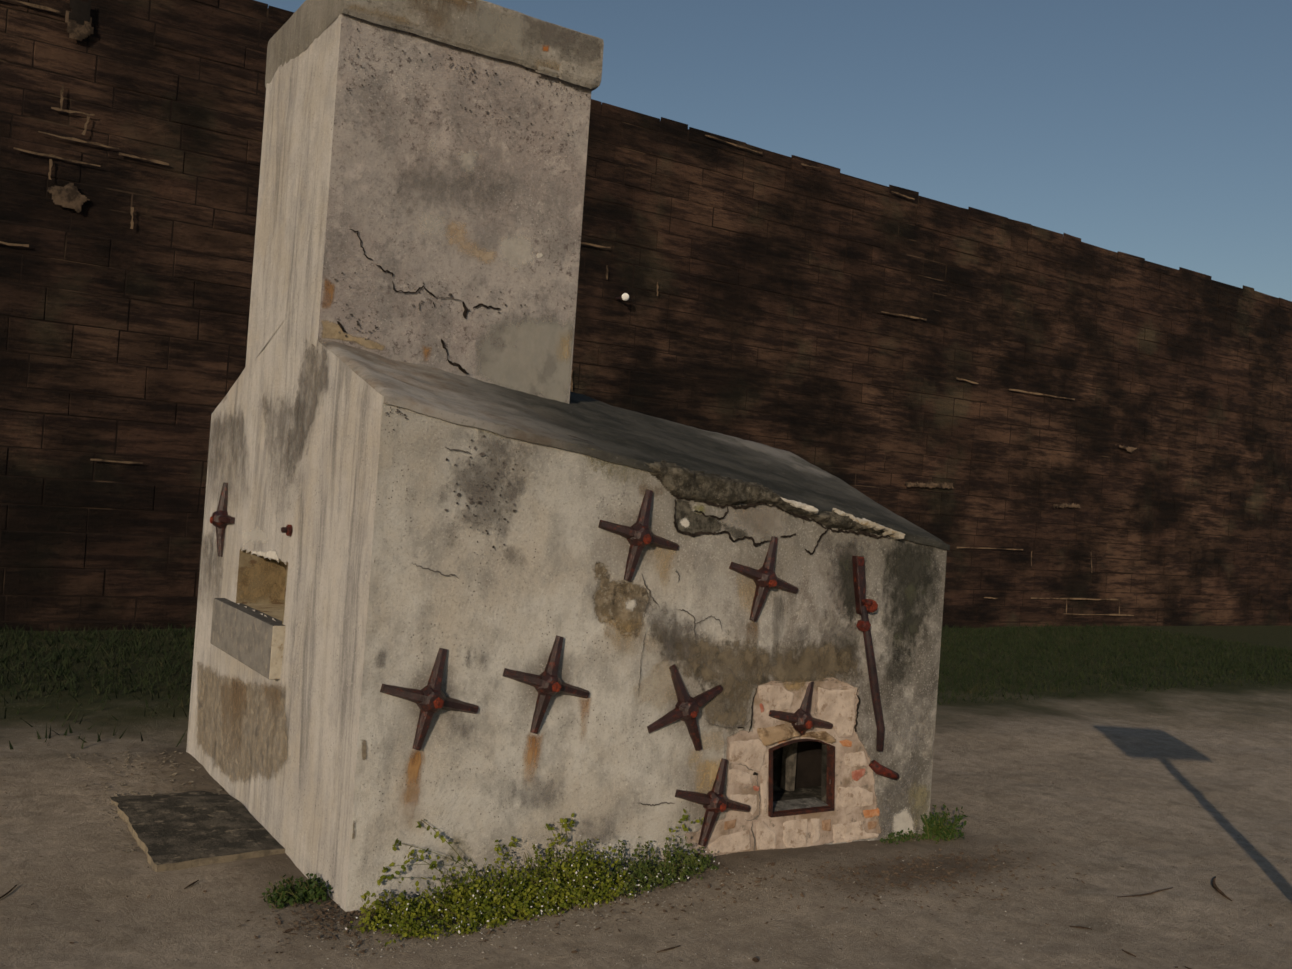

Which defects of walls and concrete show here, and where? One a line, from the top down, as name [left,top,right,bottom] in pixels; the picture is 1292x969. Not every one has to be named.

crack [350,229,501,327]
crack [441,339,469,374]
crack [657,477,891,555]
spalling [645,460,905,541]
crack [638,570,722,697]
damp [646,538,869,731]
damp [883,531,936,679]
rust [407,751,421,788]
rust [526,736,538,767]